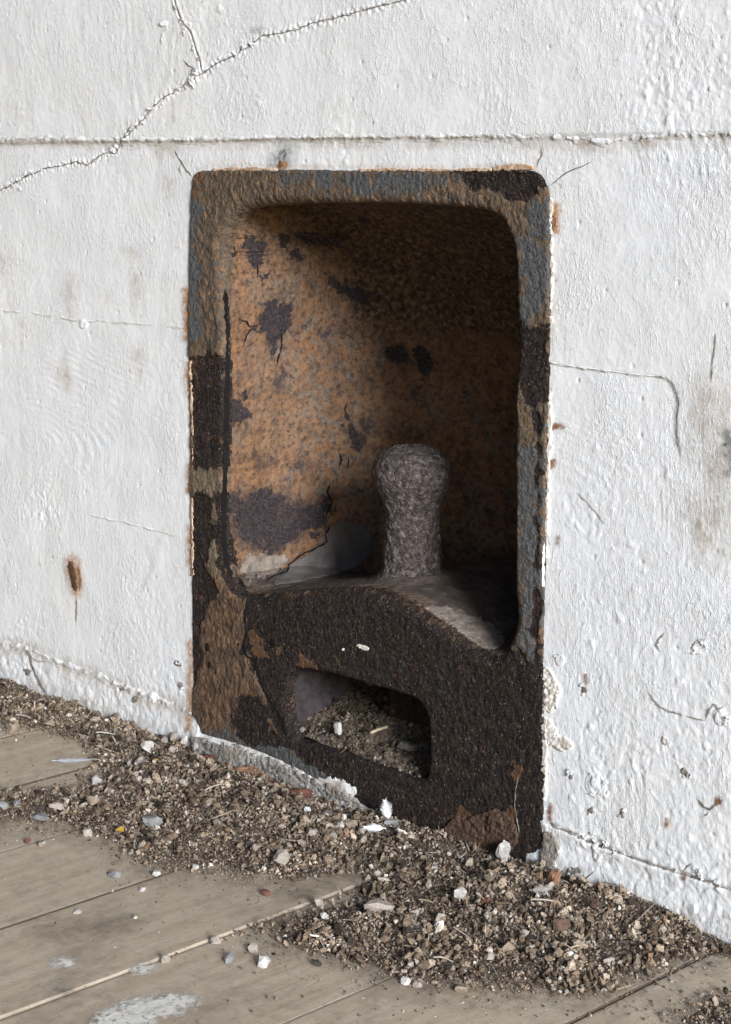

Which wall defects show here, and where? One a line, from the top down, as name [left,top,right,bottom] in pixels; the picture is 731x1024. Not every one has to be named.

crack [0,0,403,191]
corrosion [231,231,348,281]
corrosion [324,271,377,315]
corrosion [240,299,293,367]
corrosion [384,344,433,378]
corrosion [230,390,252,423]
corrosion [339,403,363,469]
corrosion [229,485,373,585]
corrosion [67,559,82,621]
corrosion [424,605,505,649]
corrosion [444,808,519,853]